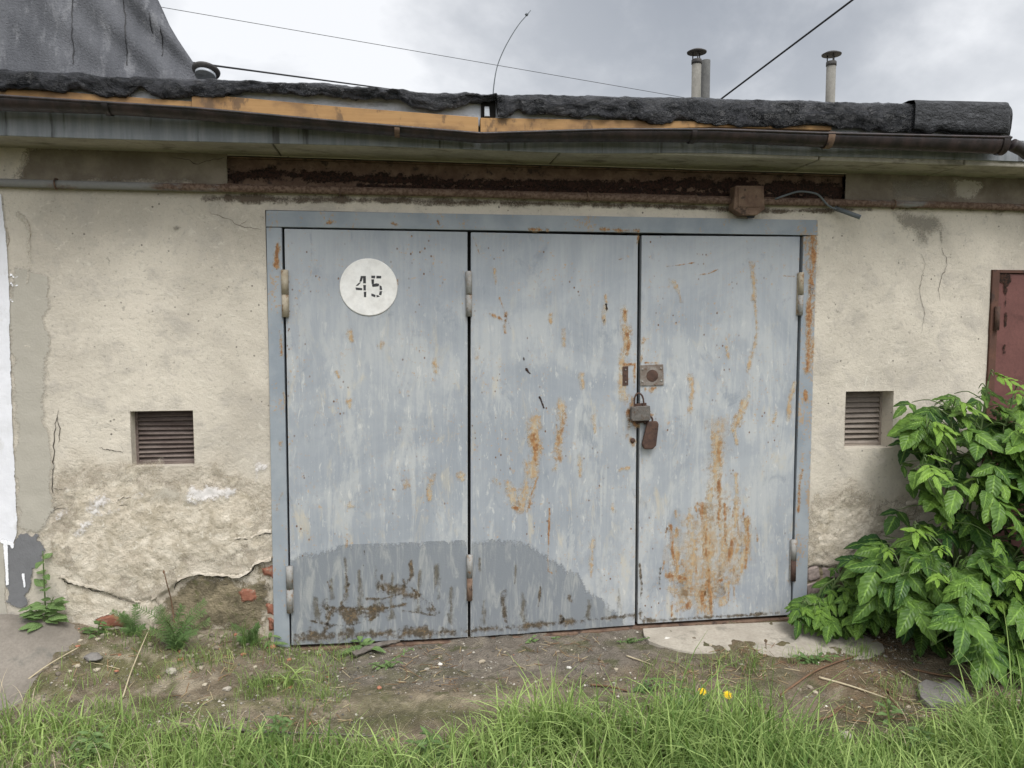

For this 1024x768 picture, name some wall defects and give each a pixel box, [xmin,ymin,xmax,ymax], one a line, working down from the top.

corrosion [203,165,871,214]
leakage [845,173,1024,239]
corrosion [805,235,818,374]
corrosion [1000,273,1011,327]
corrosion [619,308,656,446]
crack [46,414,67,521]
corrosion [496,396,566,511]
flaking render [40,460,274,631]
crack [174,561,271,589]
leakage [290,539,623,648]
corrosion [523,615,583,629]
corrosion [601,434,776,623]